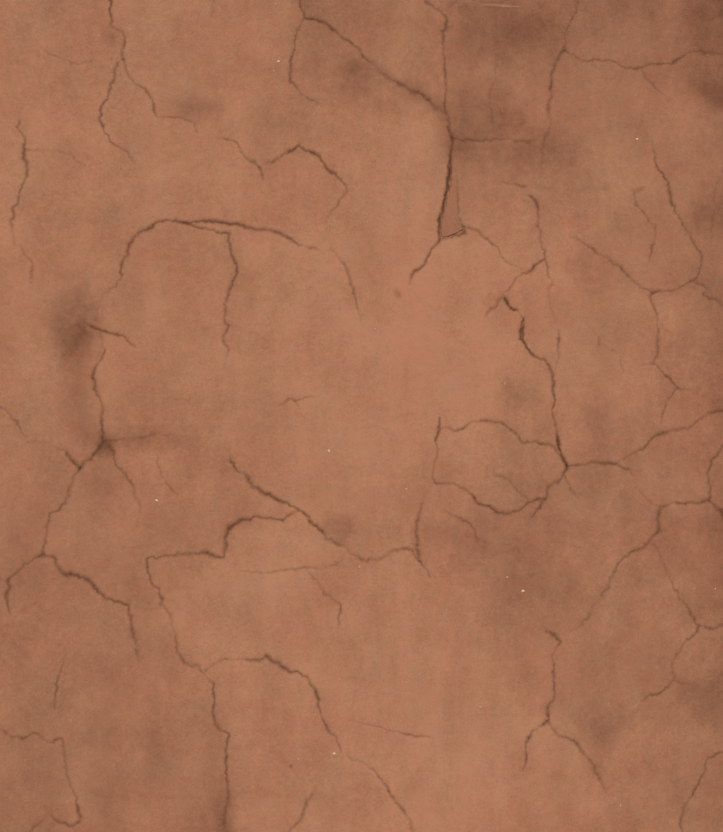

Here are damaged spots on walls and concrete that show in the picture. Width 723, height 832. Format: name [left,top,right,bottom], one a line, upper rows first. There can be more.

crack [439,154,463,237]